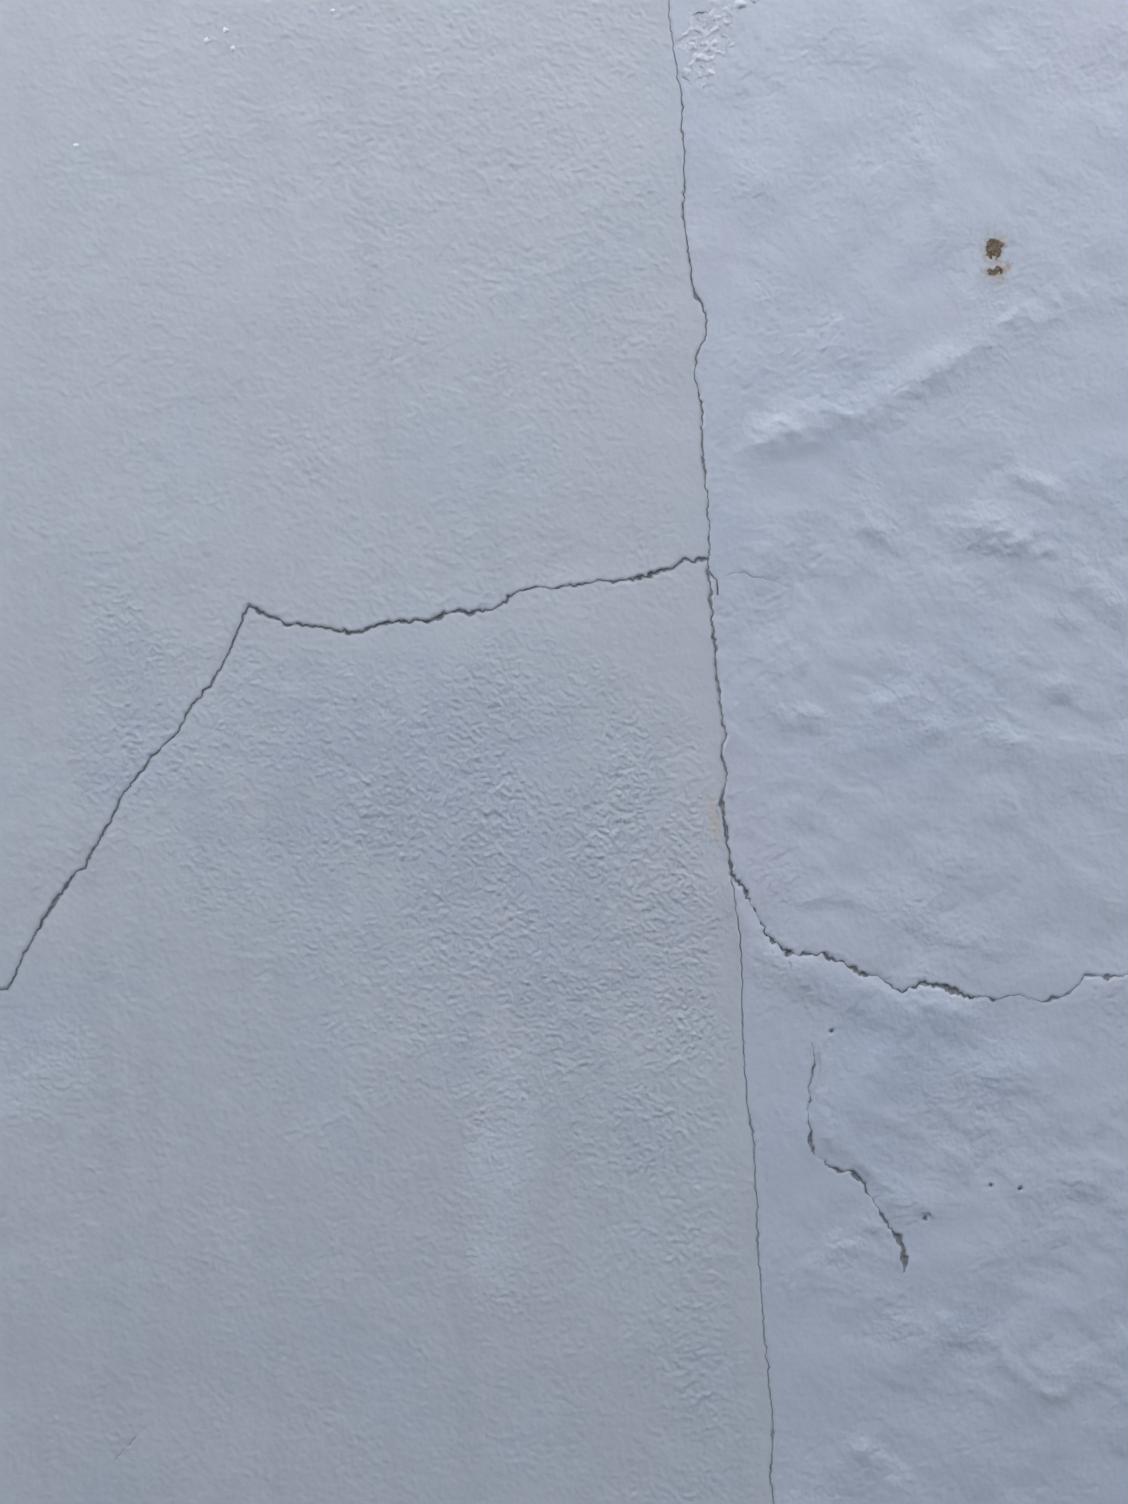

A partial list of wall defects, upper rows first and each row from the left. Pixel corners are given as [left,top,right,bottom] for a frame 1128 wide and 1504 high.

spalling [677,0,759,92]
corrosion [974,228,1015,292]
crack [0,2,1128,1003]
crack [741,1006,765,1325]
crack [808,1043,909,1272]
crack [764,1337,774,1503]